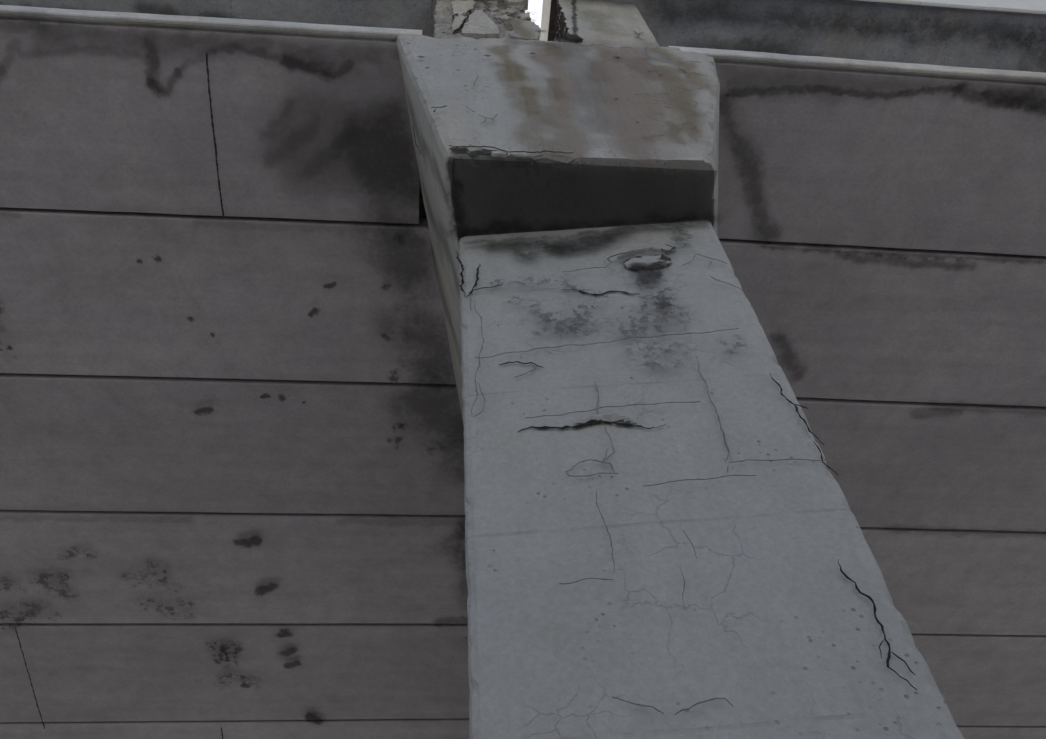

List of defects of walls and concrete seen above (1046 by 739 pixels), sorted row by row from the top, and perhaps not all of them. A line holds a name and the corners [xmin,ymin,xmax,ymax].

crack [431,0,475,35]
spalling [442,0,583,56]
spalling [562,244,677,284]
crack [562,289,648,299]
crack [456,251,543,417]
crack [518,356,839,584]
water stain [234,536,262,548]
water stain [255,583,278,595]
crack [838,559,917,690]
water stain [277,630,301,669]
water stain [305,713,322,724]
crack [612,696,734,715]